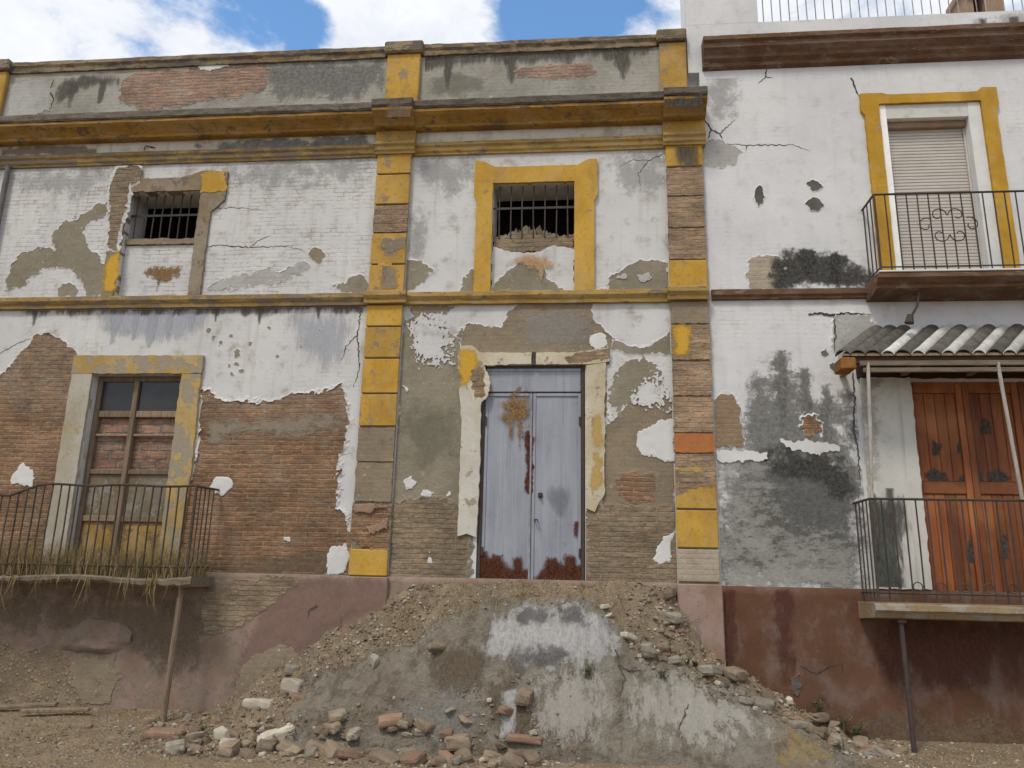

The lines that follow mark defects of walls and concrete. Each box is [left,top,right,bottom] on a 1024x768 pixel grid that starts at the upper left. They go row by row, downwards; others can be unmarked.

flaking render [115,64,273,111]
crack [705,120,809,151]
flaking render [3,165,142,297]
crack [207,236,298,249]
rust [144,266,182,285]
rust [514,254,553,280]
mould [768,248,873,289]
flaking render [0,327,81,562]
rust [500,388,535,494]
flaking render [180,304,716,638]
water stain [717,351,906,679]
rust [480,551,581,580]